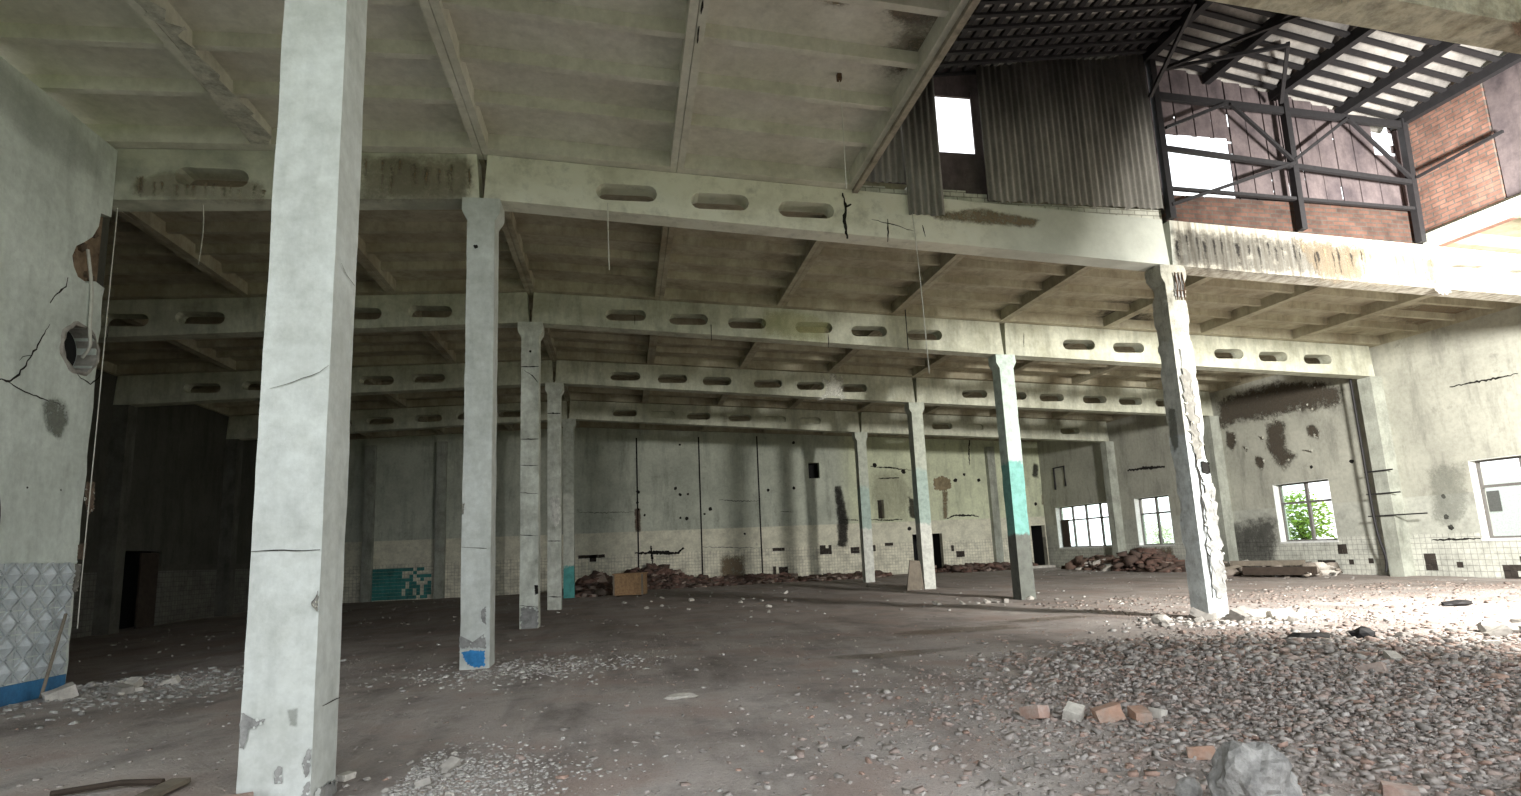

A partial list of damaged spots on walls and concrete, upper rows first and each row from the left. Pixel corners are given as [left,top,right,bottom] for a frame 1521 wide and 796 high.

crack [0,278,68,401]
hole [59,321,100,376]
leakage [43,400,67,437]
crack [1432,535,1481,543]